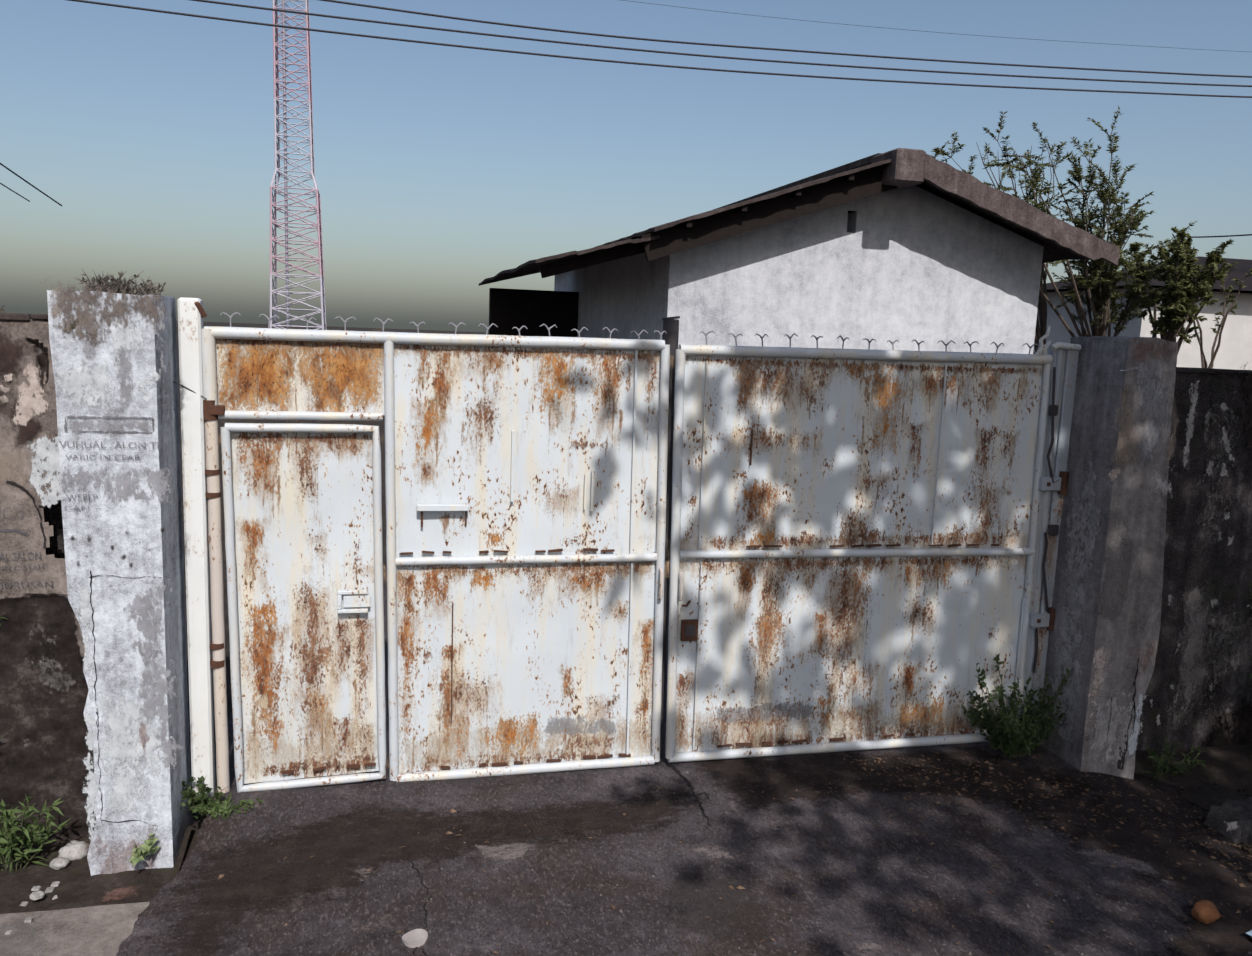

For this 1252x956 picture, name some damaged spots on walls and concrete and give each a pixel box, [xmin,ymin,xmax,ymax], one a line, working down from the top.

water stain [0,334,41,486]
peeling [0,321,148,426]
peeling [27,435,170,565]
water stain [52,281,165,374]
water stain [70,347,151,434]
water stain [1167,381,1210,467]
peeling [1192,384,1243,547]
spalling [0,586,174,849]
water stain [1166,588,1210,724]
water stain [1201,698,1252,747]